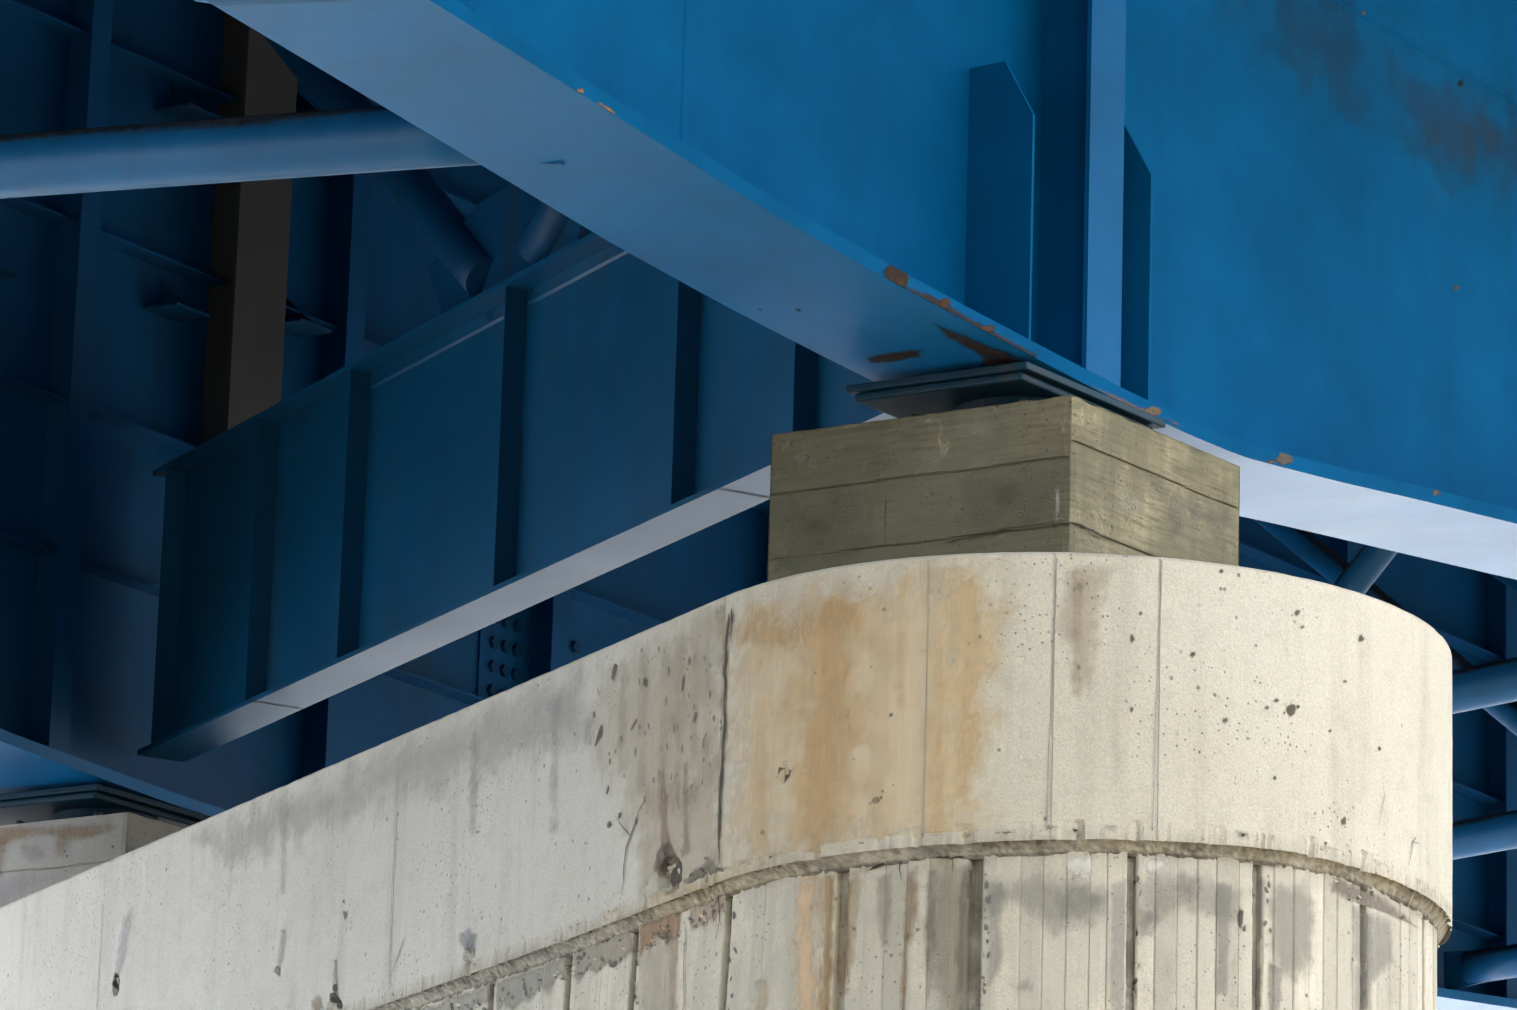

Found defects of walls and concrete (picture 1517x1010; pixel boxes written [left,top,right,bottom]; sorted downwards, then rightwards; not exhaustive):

rust [869,351,919,363]
rust [884,264,1036,367]
rust [735,588,958,838]